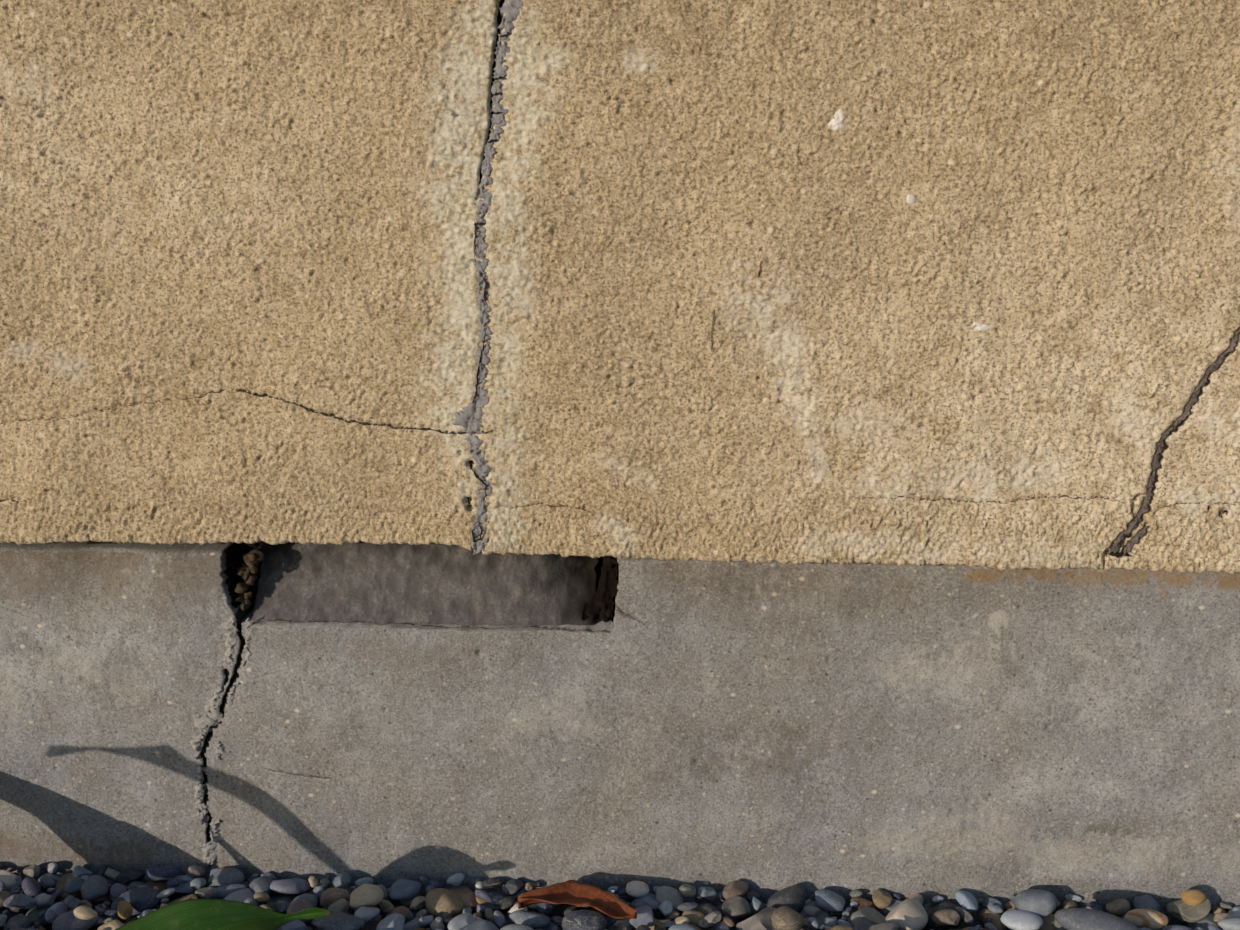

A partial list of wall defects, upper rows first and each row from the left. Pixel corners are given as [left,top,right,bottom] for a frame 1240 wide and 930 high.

crack [0,0,594,555]
crack [852,329,1240,567]
crack [190,542,645,866]